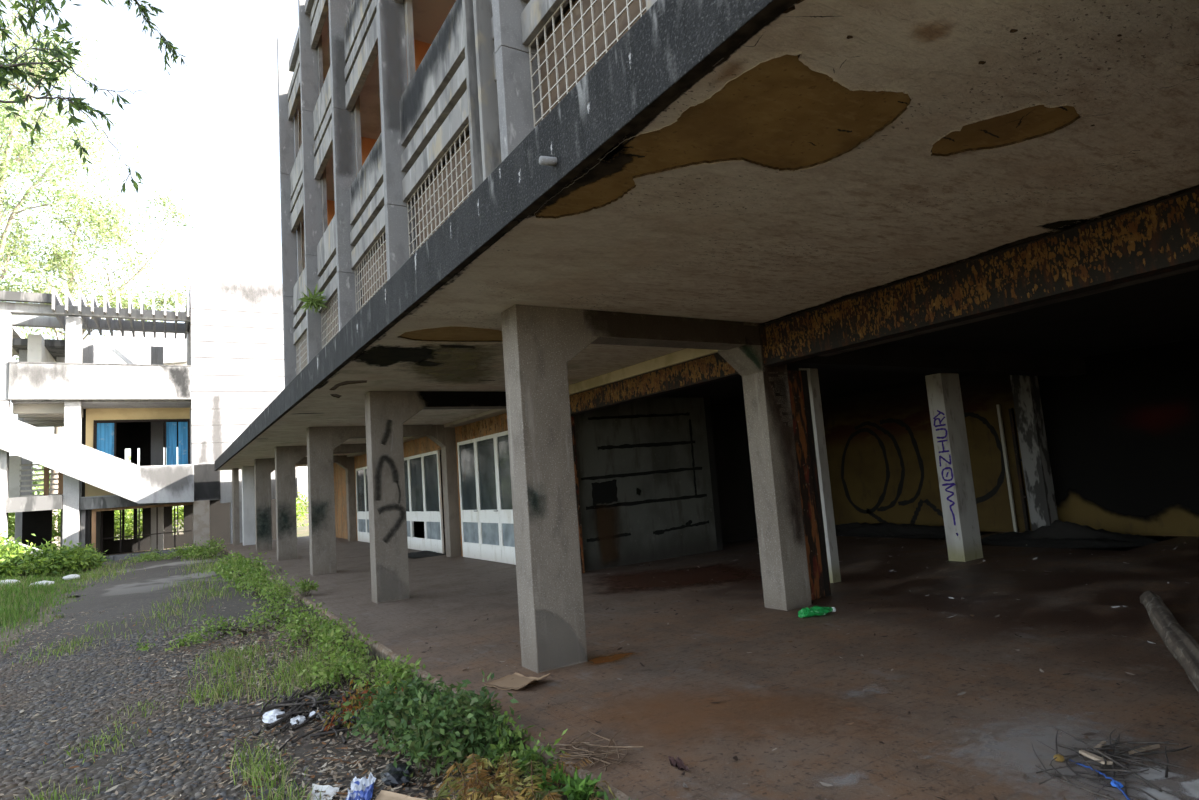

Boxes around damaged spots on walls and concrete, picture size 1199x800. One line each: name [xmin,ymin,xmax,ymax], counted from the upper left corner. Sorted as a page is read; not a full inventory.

peeling [534,51,913,219]
peeling [929,103,1095,158]
leakage [140,0,800,501]
peeling [397,326,503,342]
leakage [13,365,67,385]